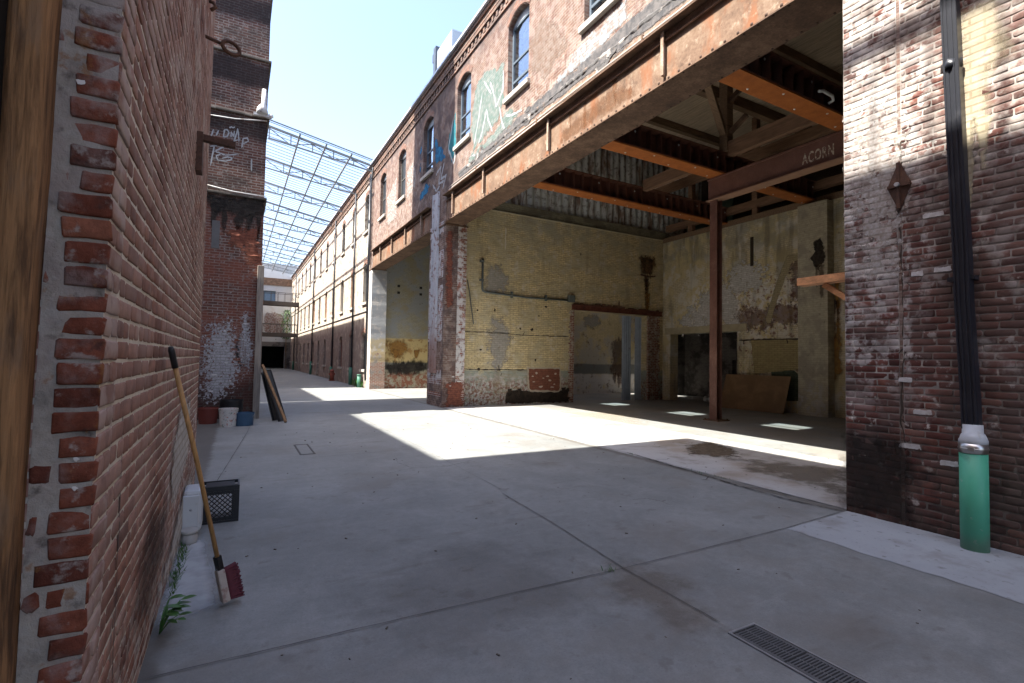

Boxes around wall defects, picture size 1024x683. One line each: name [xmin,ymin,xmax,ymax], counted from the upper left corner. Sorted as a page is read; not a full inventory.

leakage [209,195,265,241]
spalling [445,231,478,311]
peeling [678,260,798,337]
spalling [527,359,561,393]
leakage [843,436,912,522]